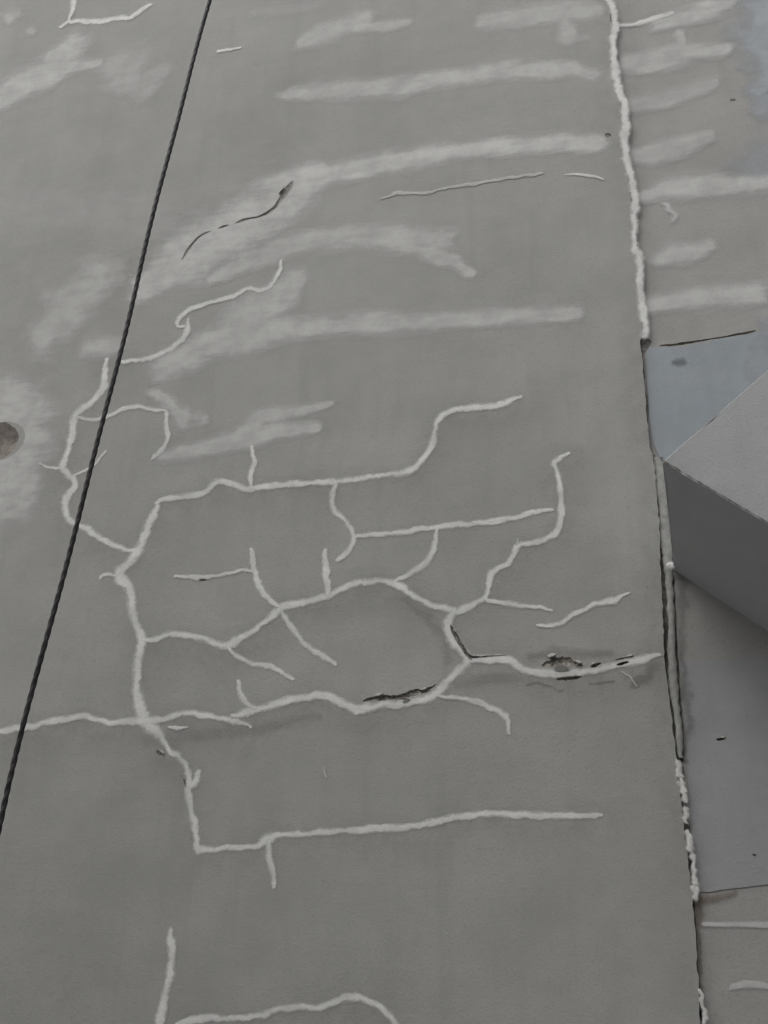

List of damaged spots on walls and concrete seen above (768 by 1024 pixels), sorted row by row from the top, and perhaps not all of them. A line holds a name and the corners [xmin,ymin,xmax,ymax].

crack [183,182,293,258]
crack [380,172,604,199]
crack [660,330,756,347]
crack [0,259,661,889]
crack [155,928,398,1024]